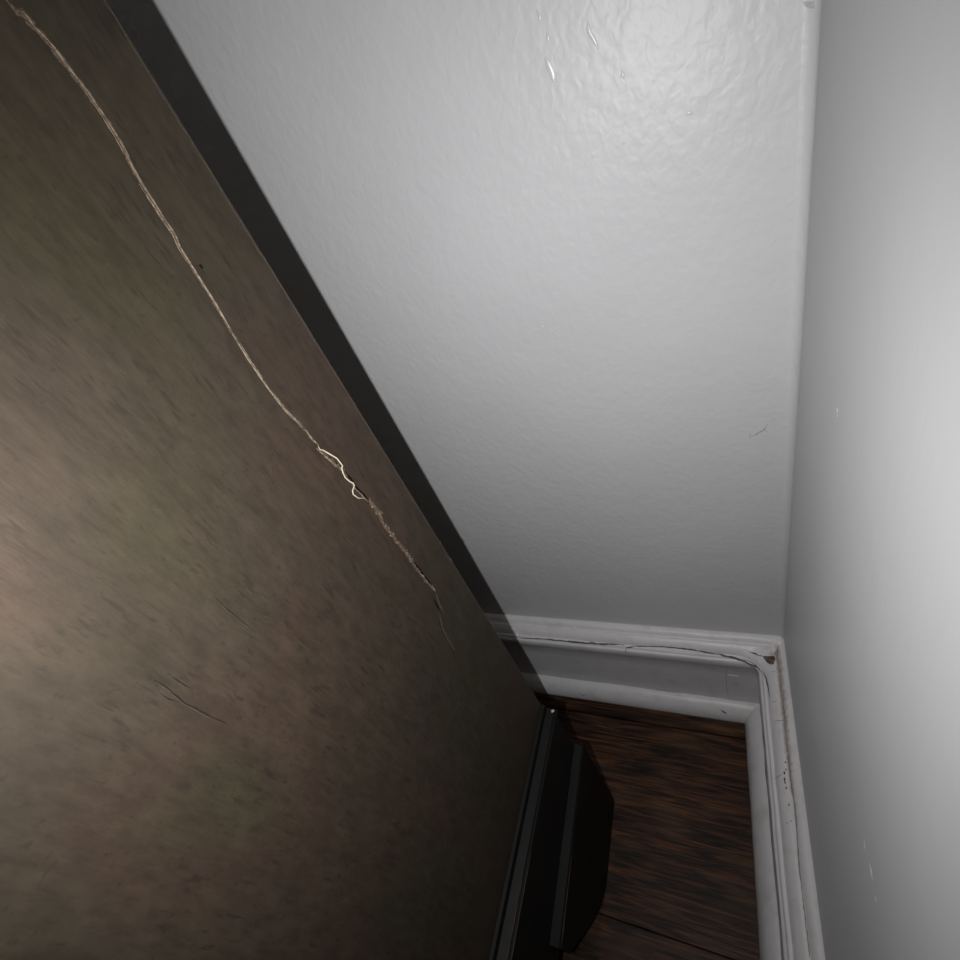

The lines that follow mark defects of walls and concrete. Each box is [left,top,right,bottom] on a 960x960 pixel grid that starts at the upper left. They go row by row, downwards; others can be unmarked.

crack [6,0,455,650]
crack [524,638,810,956]